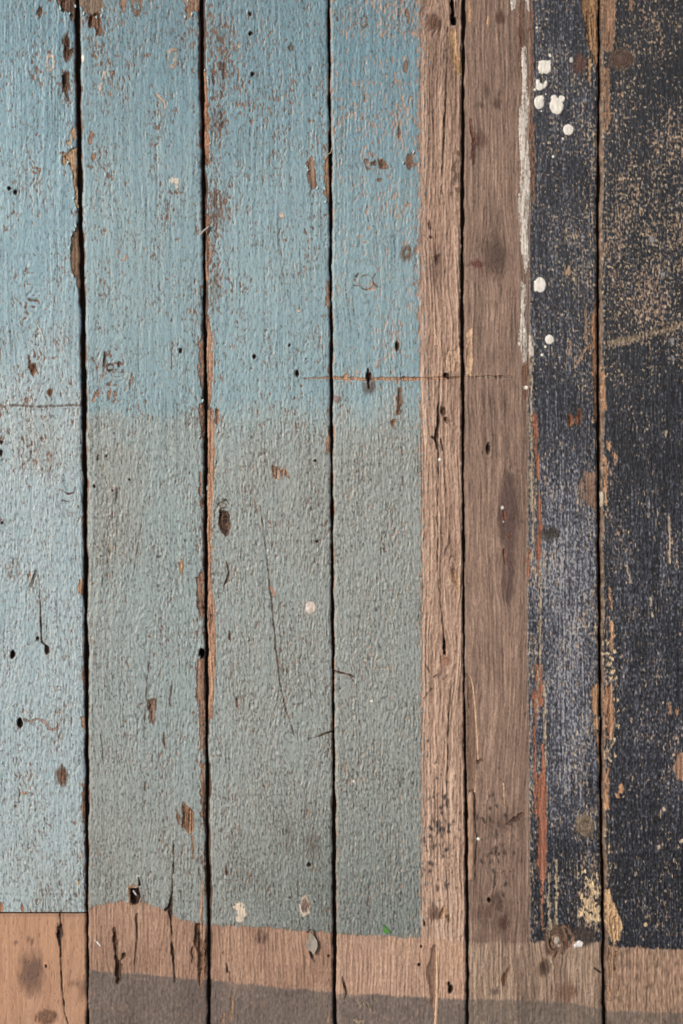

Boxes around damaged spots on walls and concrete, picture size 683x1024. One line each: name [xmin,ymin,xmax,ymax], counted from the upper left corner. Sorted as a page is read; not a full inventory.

peeling [57,0,104,36]
spalling [46,33,74,101]
peeling [60,128,101,209]
peeling [305,153,329,203]
peeling [68,222,80,291]
peeling [567,303,607,427]
crack [431,385,451,643]
peeling [526,410,543,578]
peeling [176,316,231,859]
spalling [147,698,156,724]
peeling [507,663,625,1001]